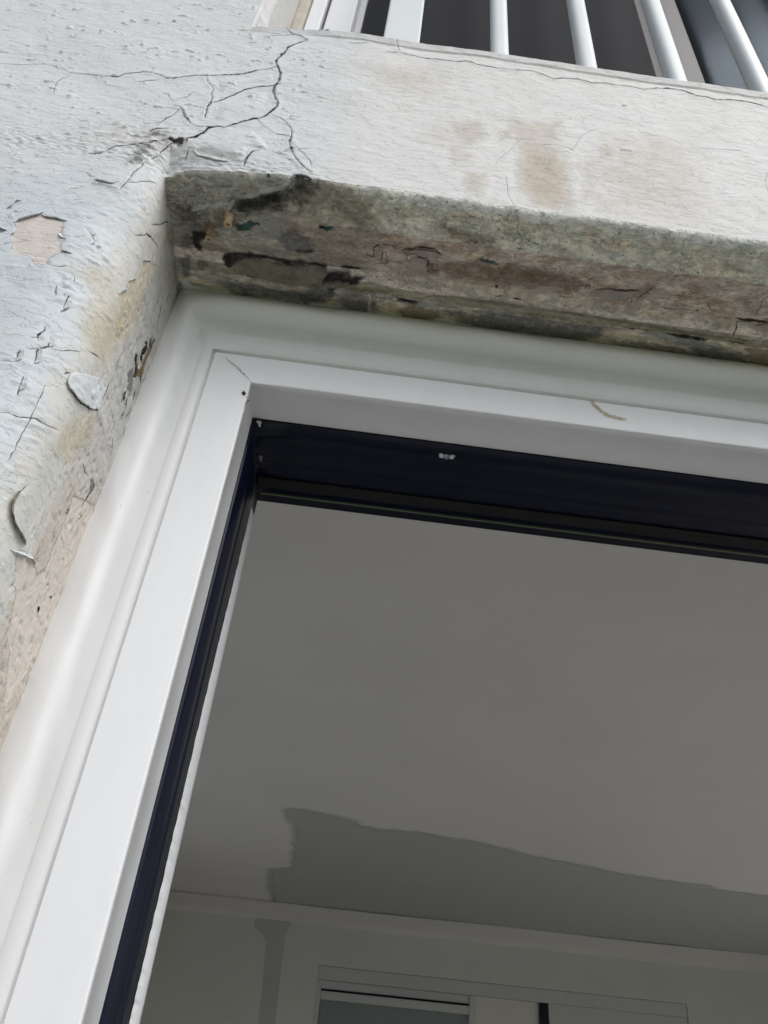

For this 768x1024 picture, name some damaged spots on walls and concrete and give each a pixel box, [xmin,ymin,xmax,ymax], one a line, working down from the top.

crack [1,27,312,188]
leakage [230,174,312,212]
peeling [0,211,95,267]
peeling [120,259,157,301]
leakage [177,206,222,276]
leakage [223,232,375,312]
crack [1,278,81,461]
peeling [67,372,109,410]
spalling [111,296,168,449]
leakage [446,311,600,340]
leakage [668,333,748,363]
peeling [4,464,95,707]